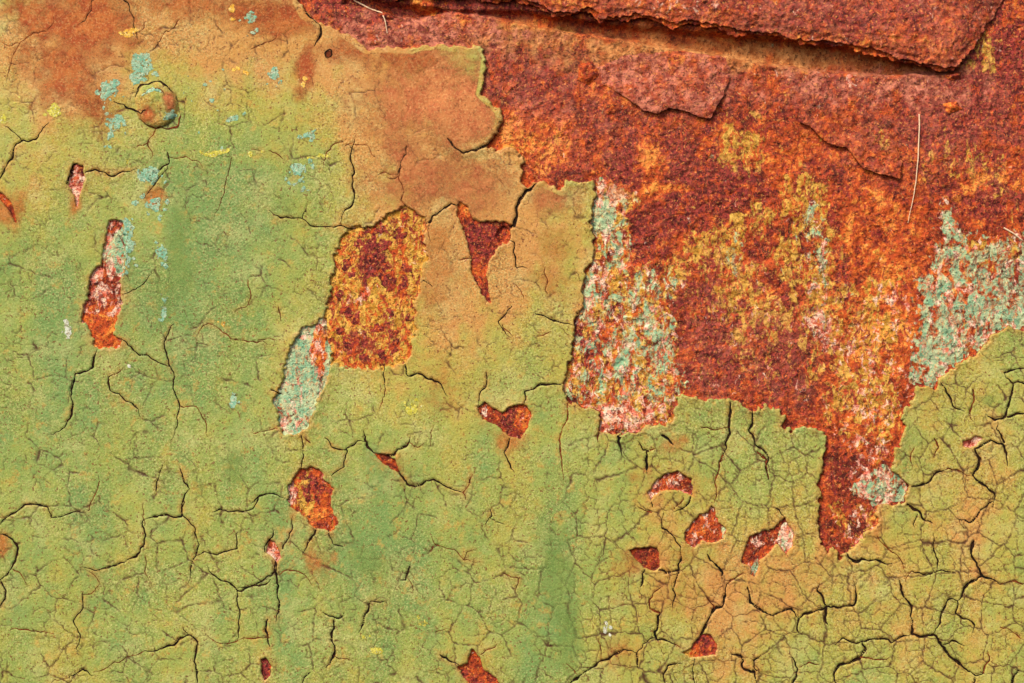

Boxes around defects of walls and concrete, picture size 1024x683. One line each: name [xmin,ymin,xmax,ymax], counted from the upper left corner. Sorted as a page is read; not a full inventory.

corrosion [154,0,311,38]
corrosion [296,45,315,91]
corrosion [376,50,507,213]
corrosion [479,0,1003,72]
crack [49,324,207,440]
peeling [273,206,428,435]
crack [498,183,575,337]
peeling [298,0,1024,560]
crack [51,465,343,683]
peeling [630,546,660,571]
peeling [741,518,794,576]
crack [567,367,1024,683]